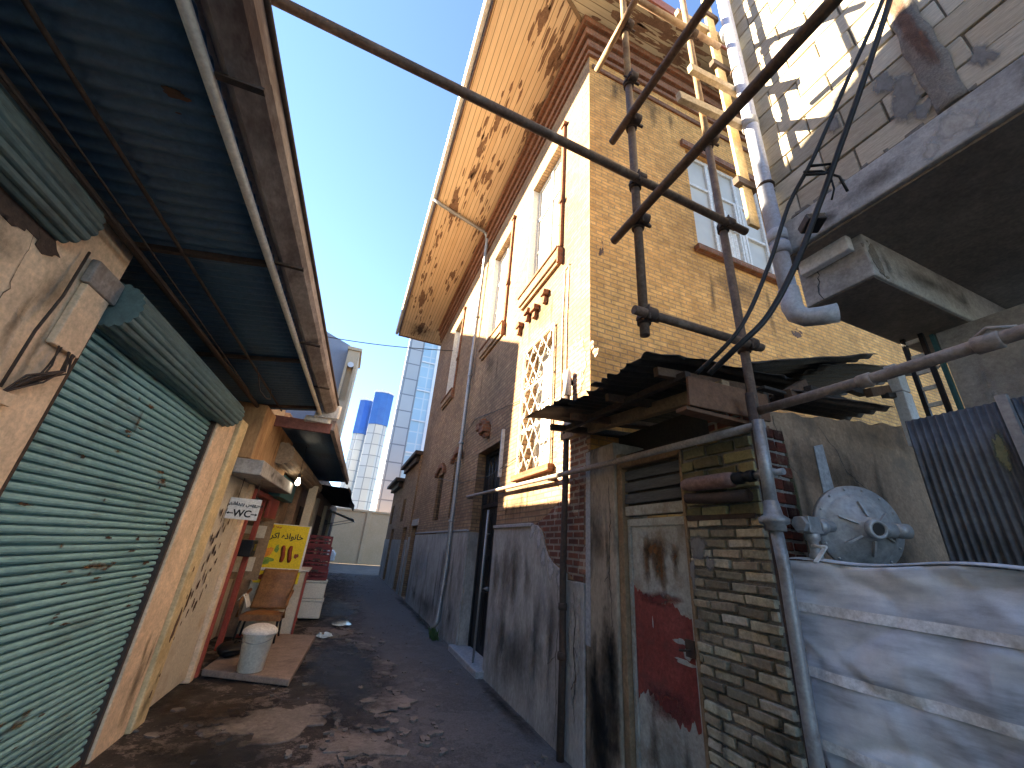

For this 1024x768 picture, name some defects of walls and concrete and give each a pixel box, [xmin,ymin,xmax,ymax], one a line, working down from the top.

rust [890,0,938,60]
peeling [411,0,576,336]
flaking render [0,186,60,258]
rust [643,540,678,588]
leakage [589,632,617,739]